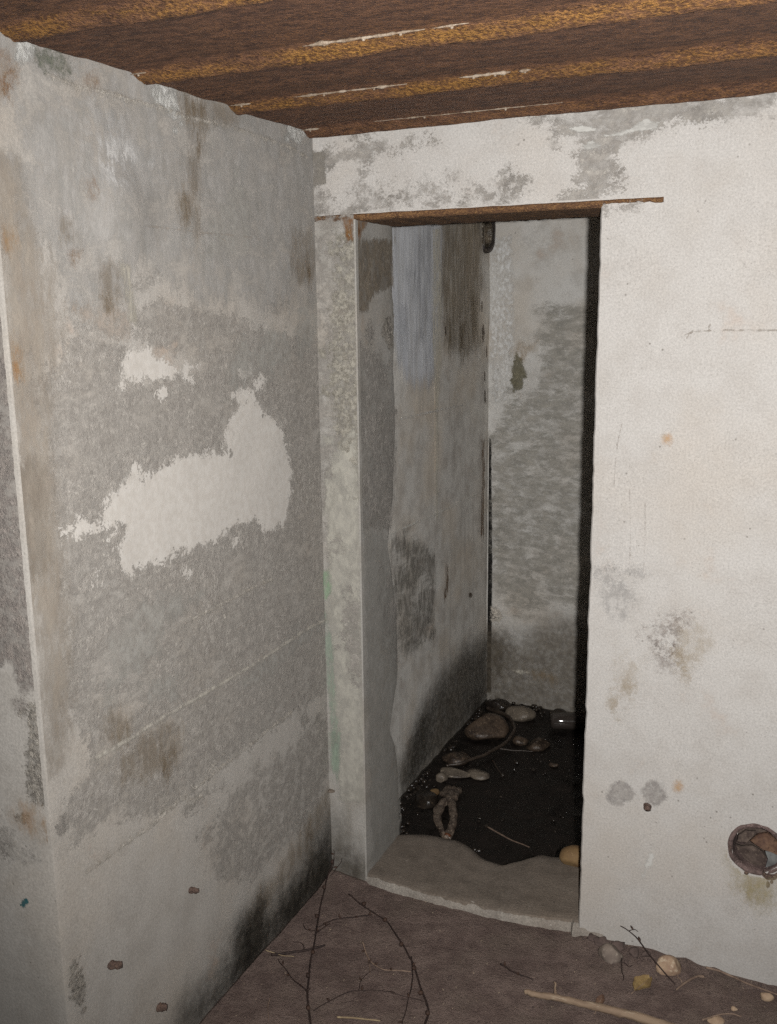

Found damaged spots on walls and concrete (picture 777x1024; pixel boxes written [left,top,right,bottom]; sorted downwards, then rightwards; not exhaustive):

flaking render [22,133,533,882]
damp [184,829,332,1024]